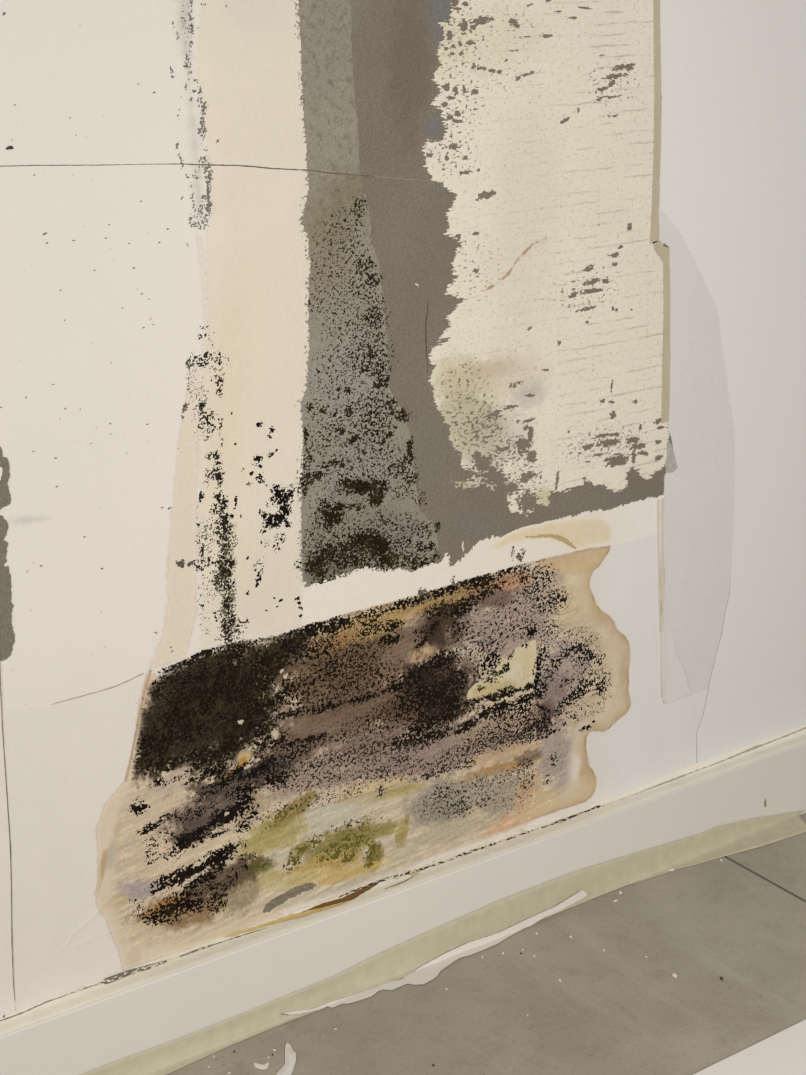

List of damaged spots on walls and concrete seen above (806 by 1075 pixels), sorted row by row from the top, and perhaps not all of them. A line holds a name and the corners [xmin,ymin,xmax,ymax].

damp [94,194,632,972]
flaking render [294,0,672,588]